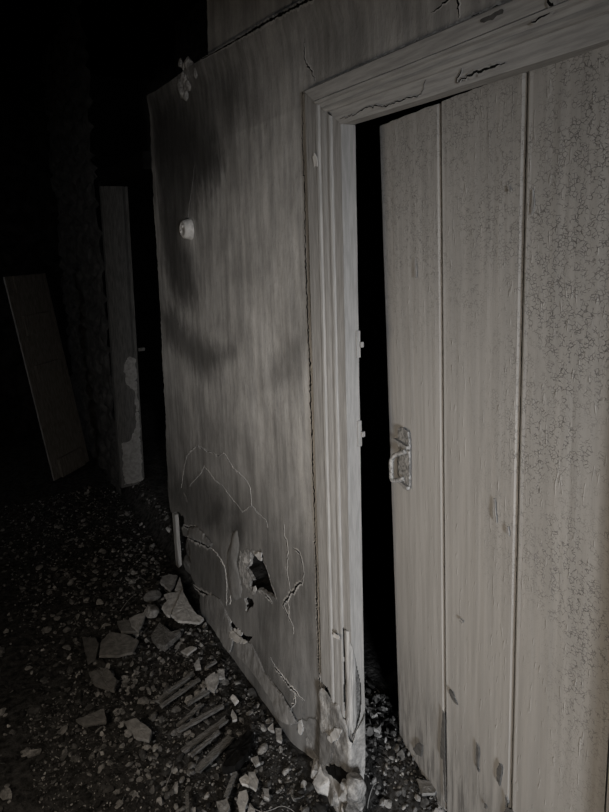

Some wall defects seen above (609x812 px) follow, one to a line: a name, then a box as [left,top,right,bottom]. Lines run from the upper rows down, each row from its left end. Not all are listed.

crack [200,0,314,61]
crack [531,0,557,24]
crack [264,0,510,712]
peeling [121,356,144,485]
crack [193,584,211,597]
spalling [238,549,278,612]
spalling [298,675,366,812]